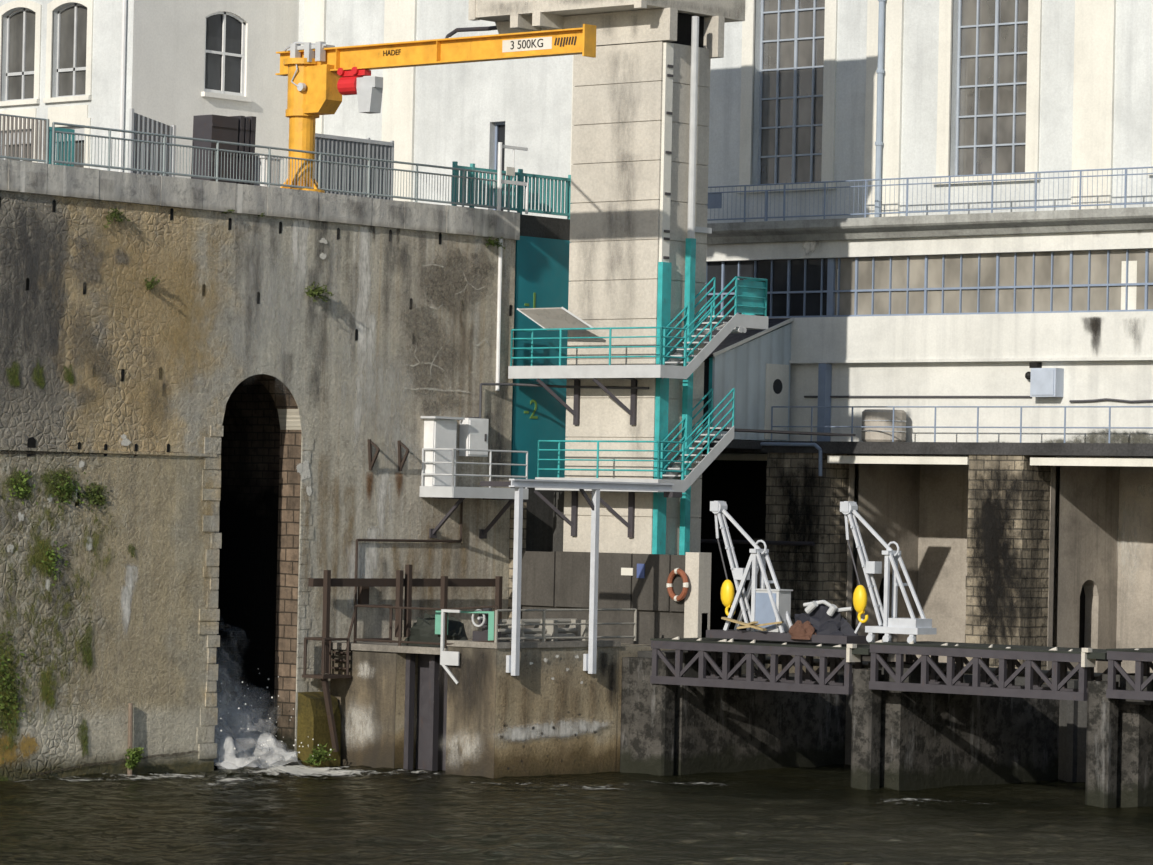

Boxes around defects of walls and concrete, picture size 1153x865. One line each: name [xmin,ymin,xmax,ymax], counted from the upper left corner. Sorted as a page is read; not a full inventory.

leakage [1086,317,1100,349]
crack [402,345,470,393]
leakage [971,473,1024,645]